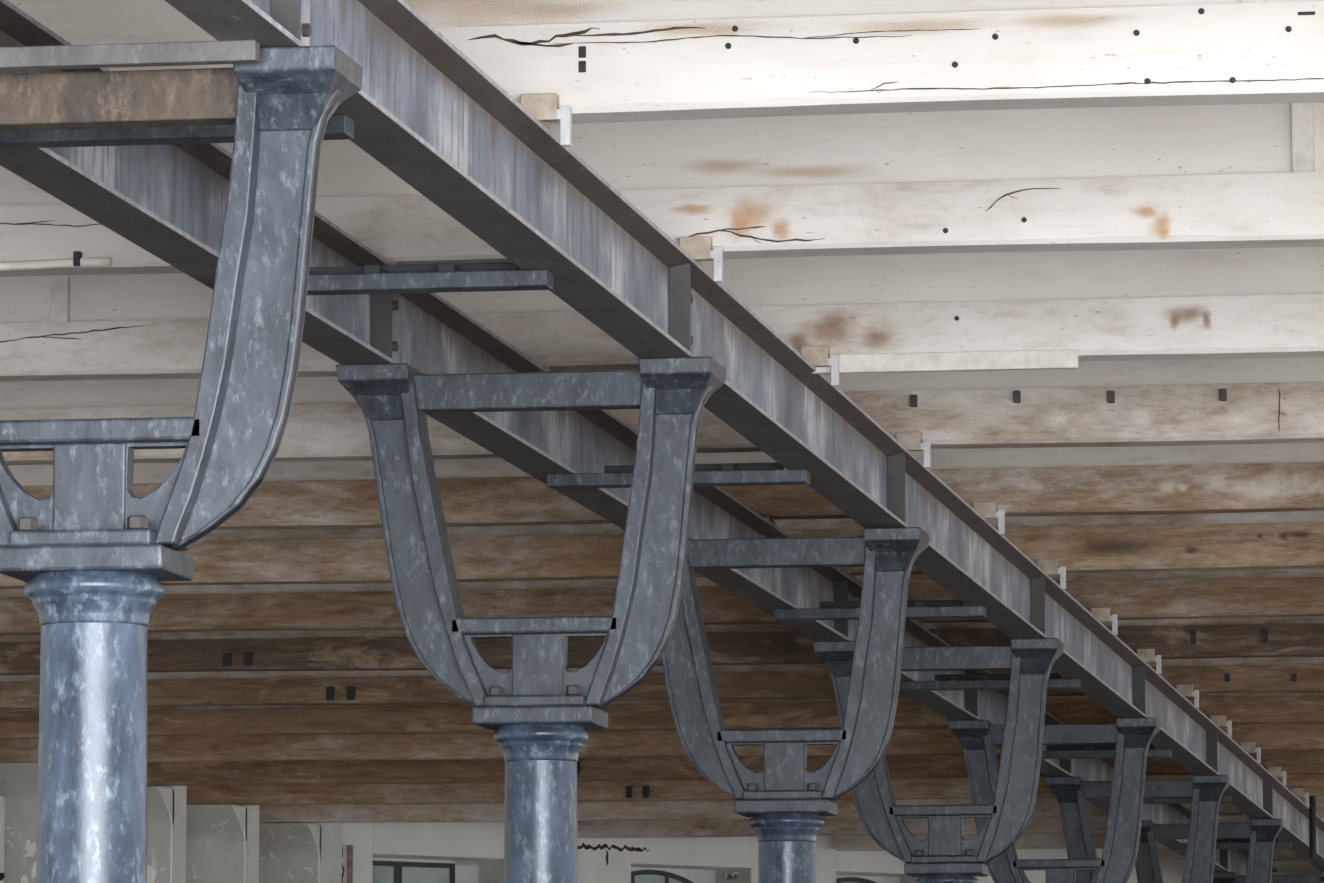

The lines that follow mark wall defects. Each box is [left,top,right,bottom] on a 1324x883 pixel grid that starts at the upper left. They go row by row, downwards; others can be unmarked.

crack [468,27,981,47]
crack [817,78,1324,92]
corrosion [671,191,794,246]
corrosion [1127,202,1174,240]
crack [678,226,825,244]